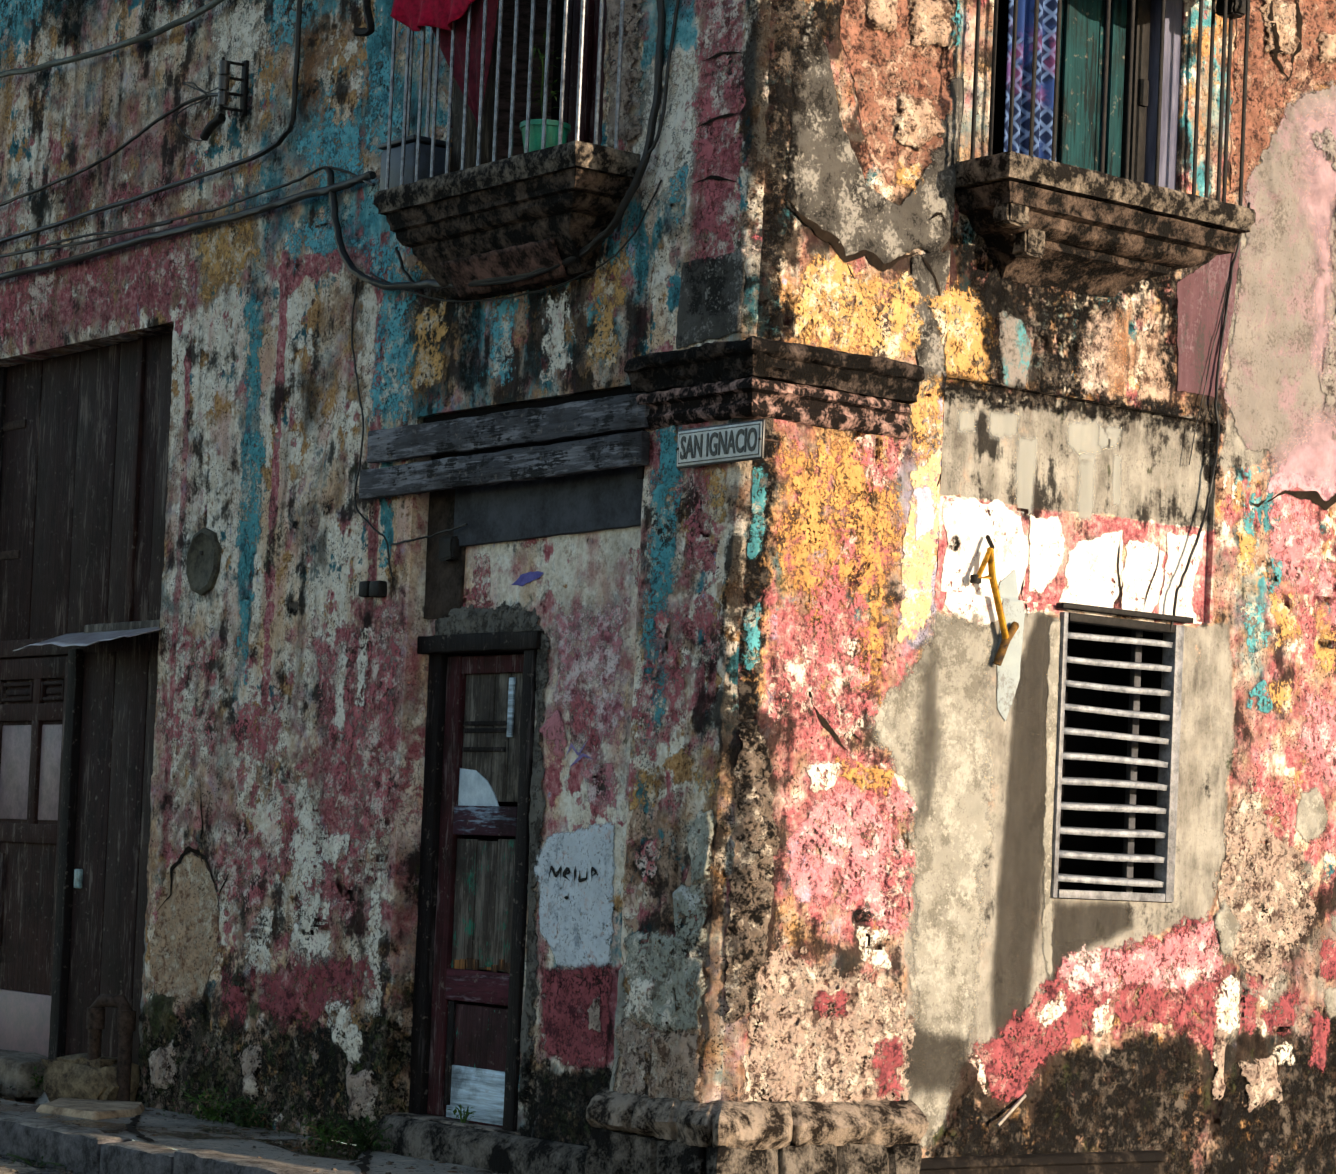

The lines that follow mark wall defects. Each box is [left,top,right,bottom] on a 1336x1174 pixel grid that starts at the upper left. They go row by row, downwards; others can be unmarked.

spalling [840,0,963,188]
spalling [1229,0,1336,195]
water stain [738,418,781,737]
water stain [941,188,1226,519]
peeling [1235,212,1336,672]
crack [1251,490,1336,510]
peeling [690,253,1206,1103]
crack [157,796,229,911]
spalling [148,429,429,1127]
crack [103,1115,154,1142]
water stain [135,991,412,1145]
water stain [903,1006,1336,1174]